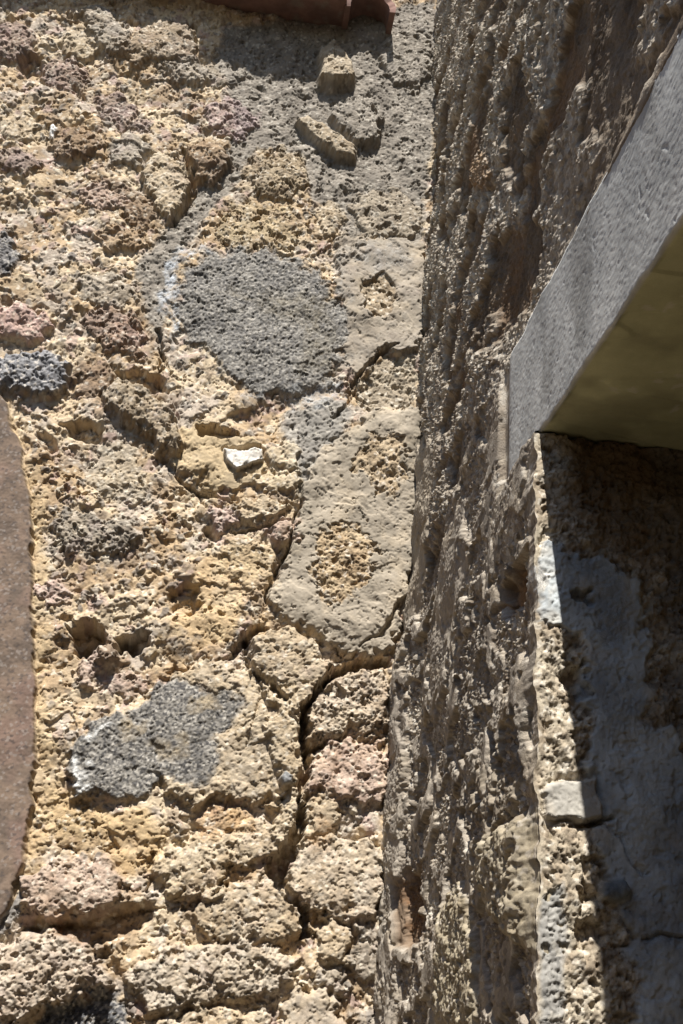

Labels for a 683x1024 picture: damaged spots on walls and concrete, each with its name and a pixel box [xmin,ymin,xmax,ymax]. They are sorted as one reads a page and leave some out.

crack [330,342,399,420]
crack [227,481,304,747]
crack [262,599,400,941]